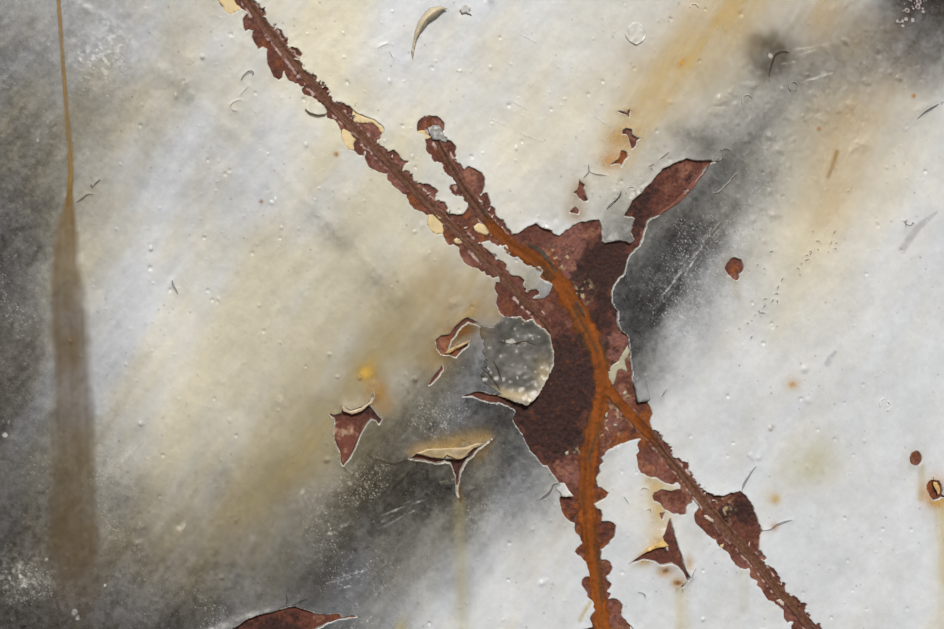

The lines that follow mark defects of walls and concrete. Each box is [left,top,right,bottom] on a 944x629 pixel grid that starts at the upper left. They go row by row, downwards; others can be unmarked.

damp [57,0,75,294]
damp [55,306,84,387]
corrosion [442,301,480,337]
peeling [218,0,821,629]